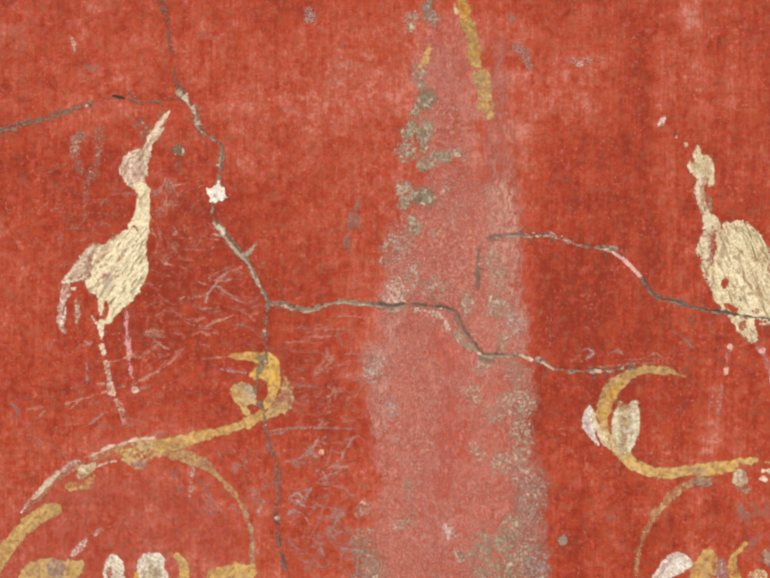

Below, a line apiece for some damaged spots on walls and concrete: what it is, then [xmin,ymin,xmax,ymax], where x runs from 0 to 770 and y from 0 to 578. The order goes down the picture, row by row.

crack [0,0,225,185]
peeling [394,62,467,172]
crack [211,202,637,578]
leakage [361,18,550,578]
crack [474,229,770,321]